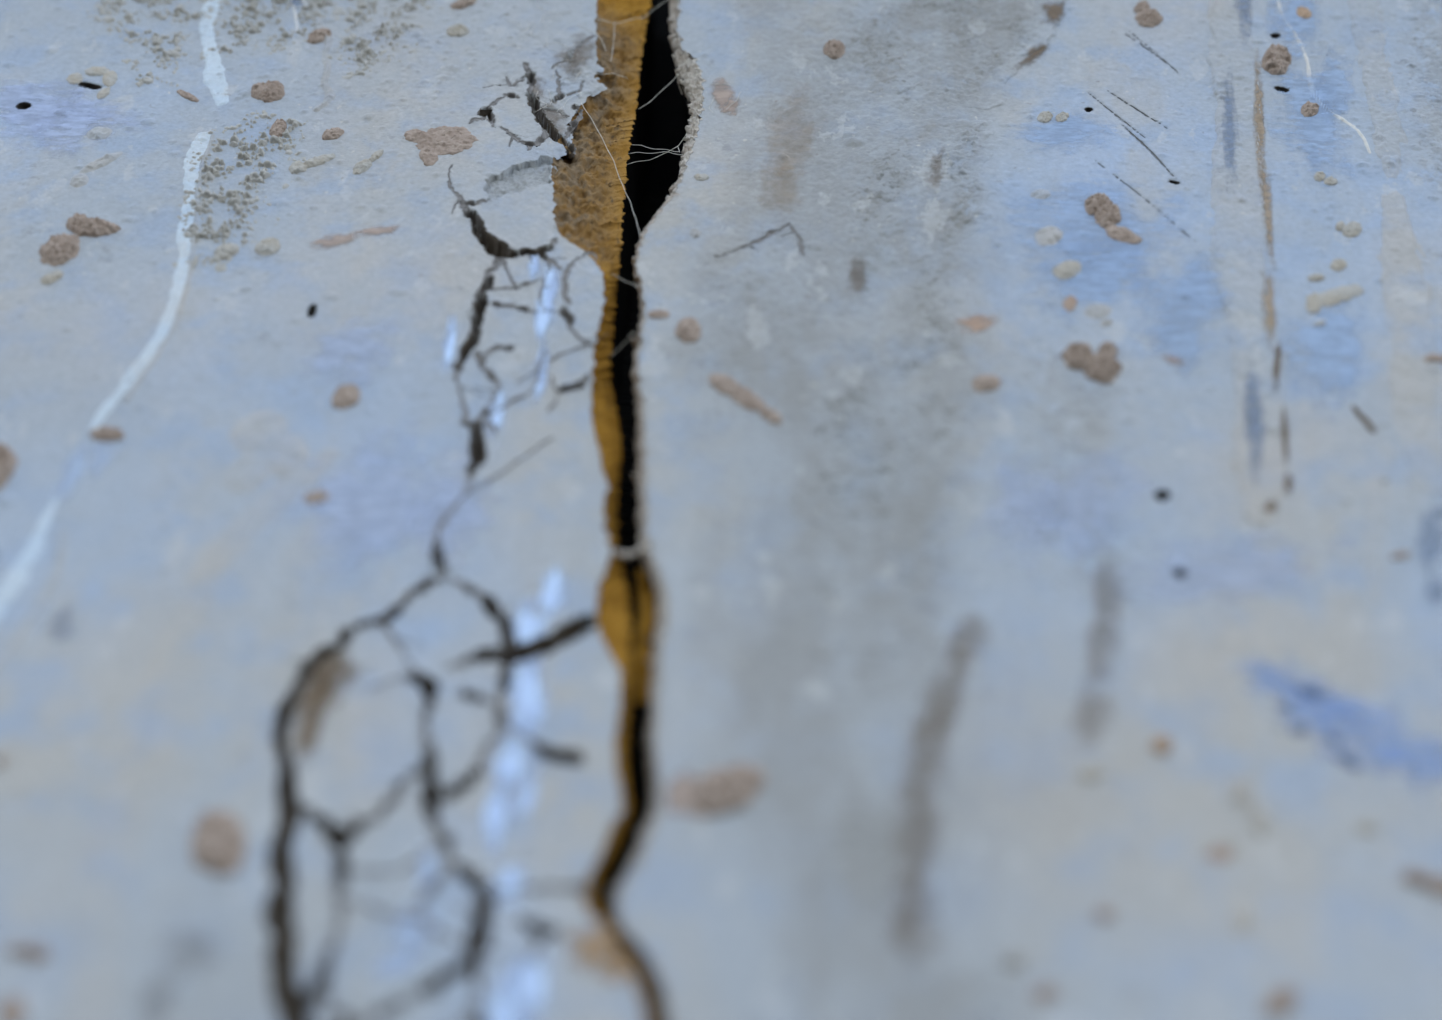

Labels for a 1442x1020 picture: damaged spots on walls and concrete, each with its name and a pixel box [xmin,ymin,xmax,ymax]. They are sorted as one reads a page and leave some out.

crack [262,0,707,1020]